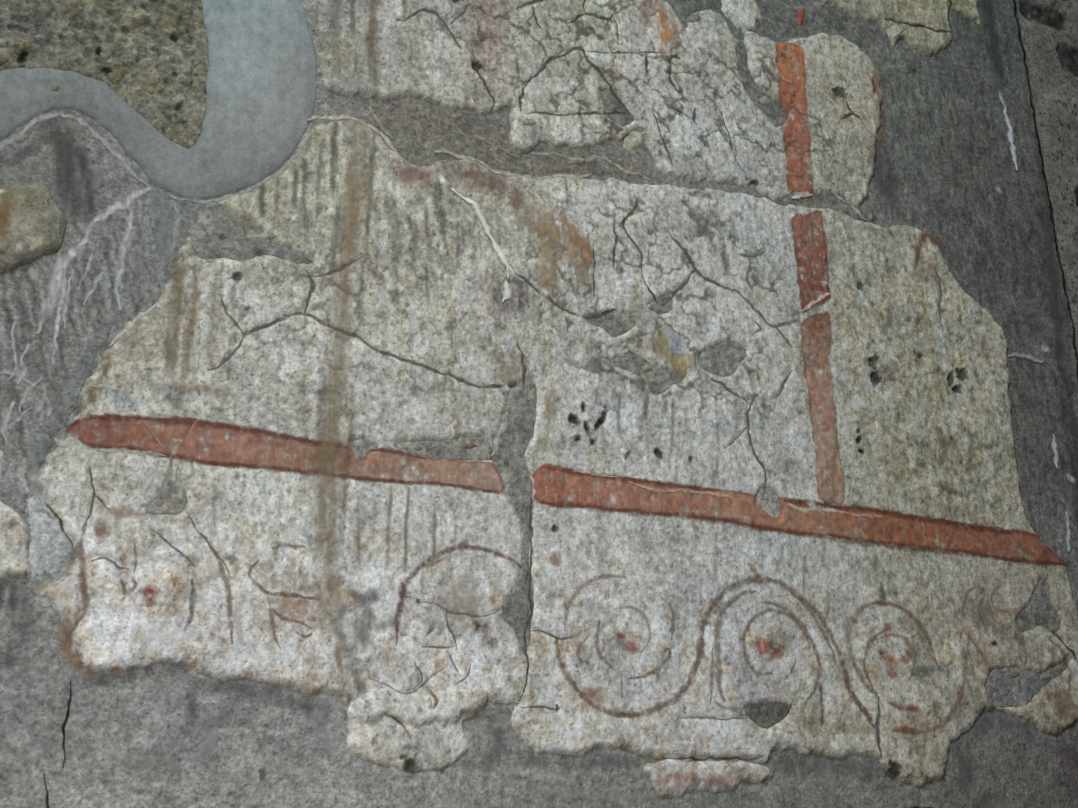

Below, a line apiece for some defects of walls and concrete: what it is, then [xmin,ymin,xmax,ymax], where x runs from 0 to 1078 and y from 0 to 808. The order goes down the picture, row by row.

spalling [0,0,210,149]
spalling [737,39,789,127]
leakage [0,114,157,346]
leakage [157,134,311,253]
spalling [185,201,313,264]
leakage [0,321,47,457]
leakage [318,136,369,555]
crack [207,256,526,388]
crack [510,197,801,494]
crack [370,601,499,739]
crack [516,494,573,712]
spalling [745,702,792,729]